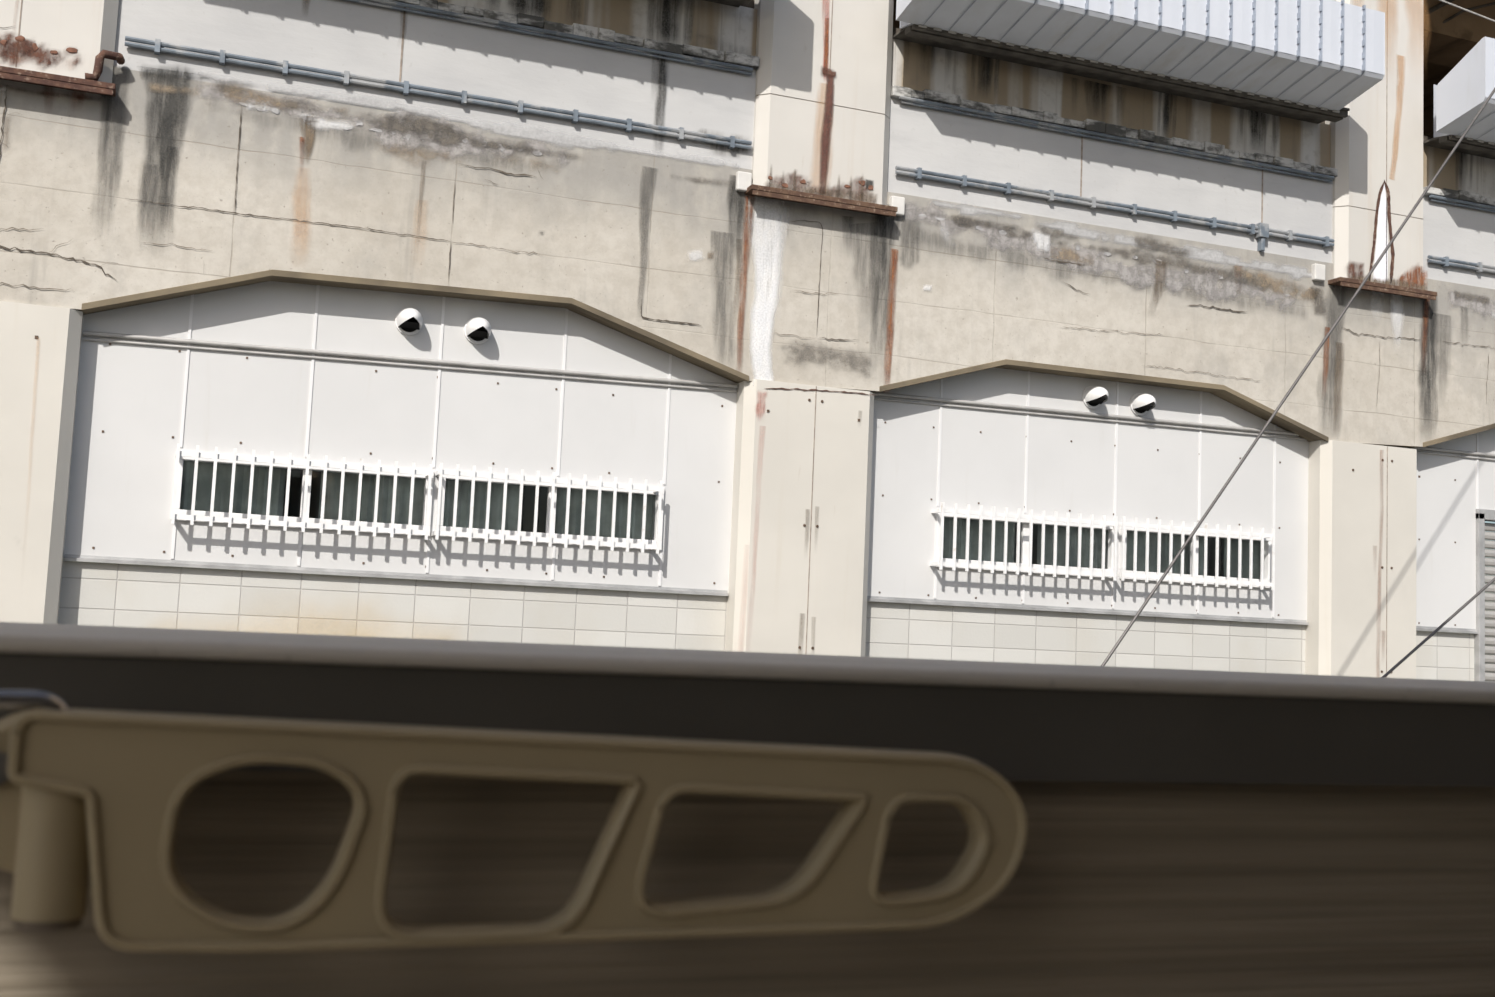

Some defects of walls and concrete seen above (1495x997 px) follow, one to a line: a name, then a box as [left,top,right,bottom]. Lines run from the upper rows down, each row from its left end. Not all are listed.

damp [513,0,545,15]
rust [0,26,78,66]
crack [0,87,20,155]
damp [103,67,127,185]
damp [143,68,191,214]
damp [1163,93,1172,128]
crack [126,105,543,280]
rust [738,16,874,353]
crack [0,227,211,280]